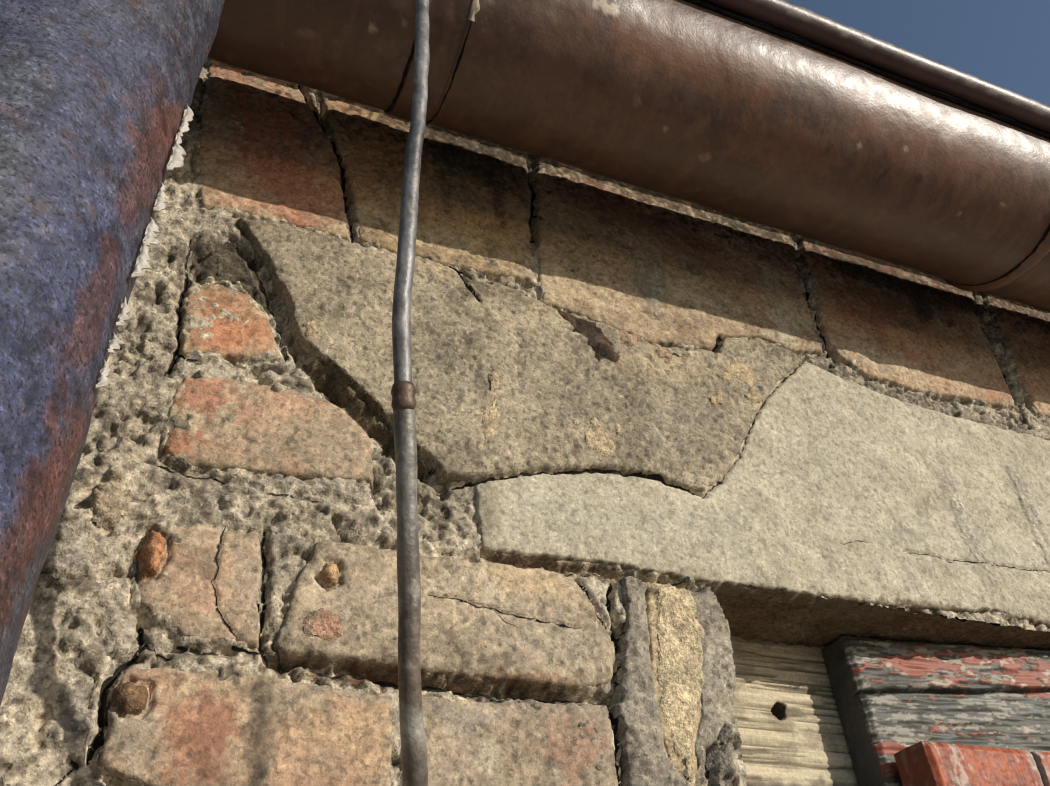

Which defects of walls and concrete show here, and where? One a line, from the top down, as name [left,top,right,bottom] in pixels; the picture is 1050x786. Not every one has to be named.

crack [298,85,353,243]
crack [528,182,542,243]
crack [164,240,198,377]
spalling [556,308,643,362]
crack [436,278,829,499]
crack [54,526,620,786]